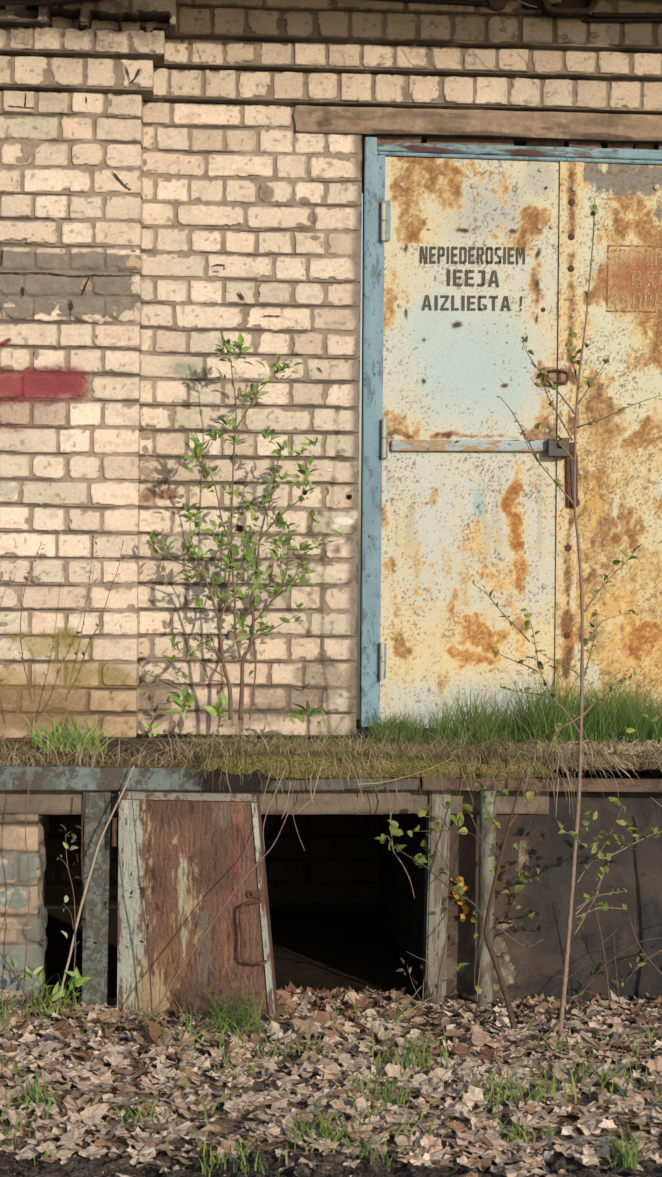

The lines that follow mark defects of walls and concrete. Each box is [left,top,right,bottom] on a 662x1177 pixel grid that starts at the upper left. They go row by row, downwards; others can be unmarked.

spalling [0,249,142,324]
peeling [0,879,32,931]
peeling [0,955,43,991]